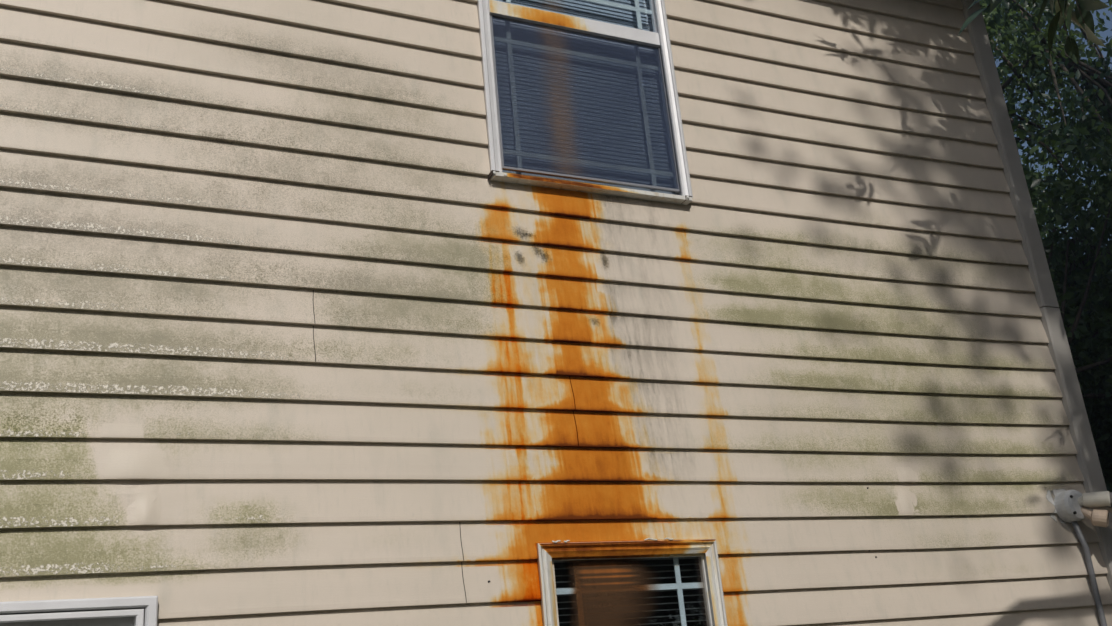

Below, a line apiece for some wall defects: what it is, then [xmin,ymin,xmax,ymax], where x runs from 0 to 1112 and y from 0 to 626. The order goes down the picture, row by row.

rust [536,211,593,250]
rust [546,336,620,346]
rust [547,367,619,379]
rust [547,404,626,413]
rust [531,434,645,482]
rust [534,499,658,521]
rust [515,539,716,626]
rust [501,595,542,603]